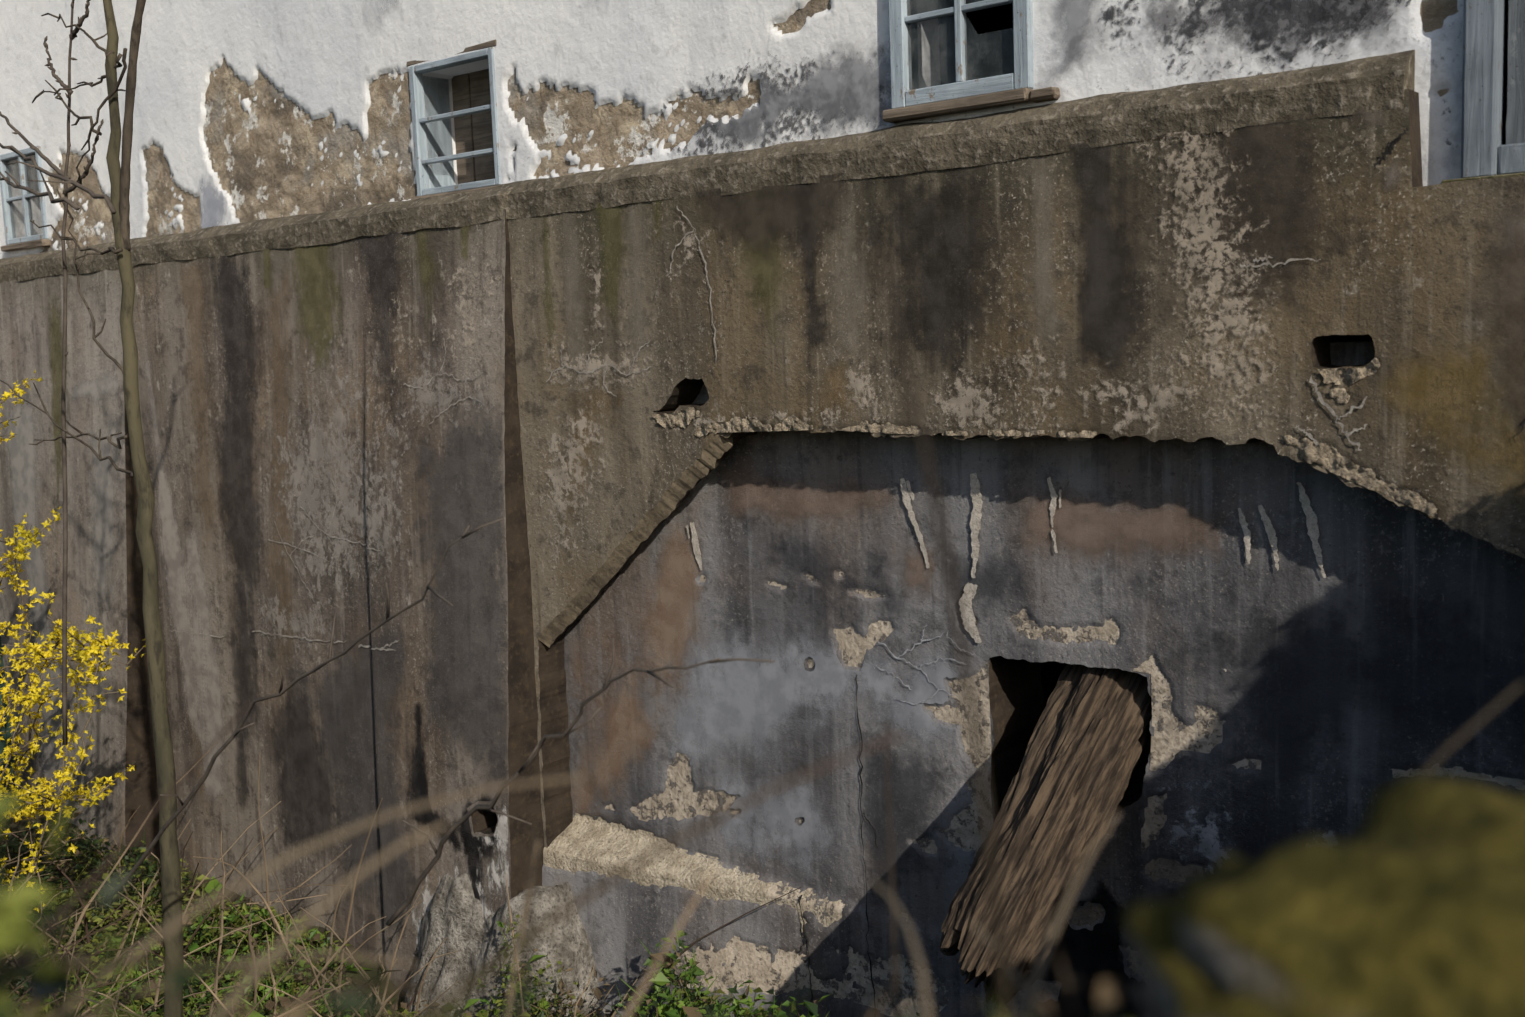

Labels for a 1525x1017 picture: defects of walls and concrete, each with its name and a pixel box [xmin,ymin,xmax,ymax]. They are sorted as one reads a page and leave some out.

peeling [774,0,831,34]
water stain [1057,0,1411,79]
peeling [1420,0,1459,32]
peeling [143,142,202,237]
peeling [203,58,417,223]
peeling [507,68,761,180]
water stain [673,51,892,156]
water stain [144,226,505,803]
water stain [953,565,1006,643]
water stain [1229,627,1525,752]
water stain [274,639,509,954]
peeling [543,753,949,1017]